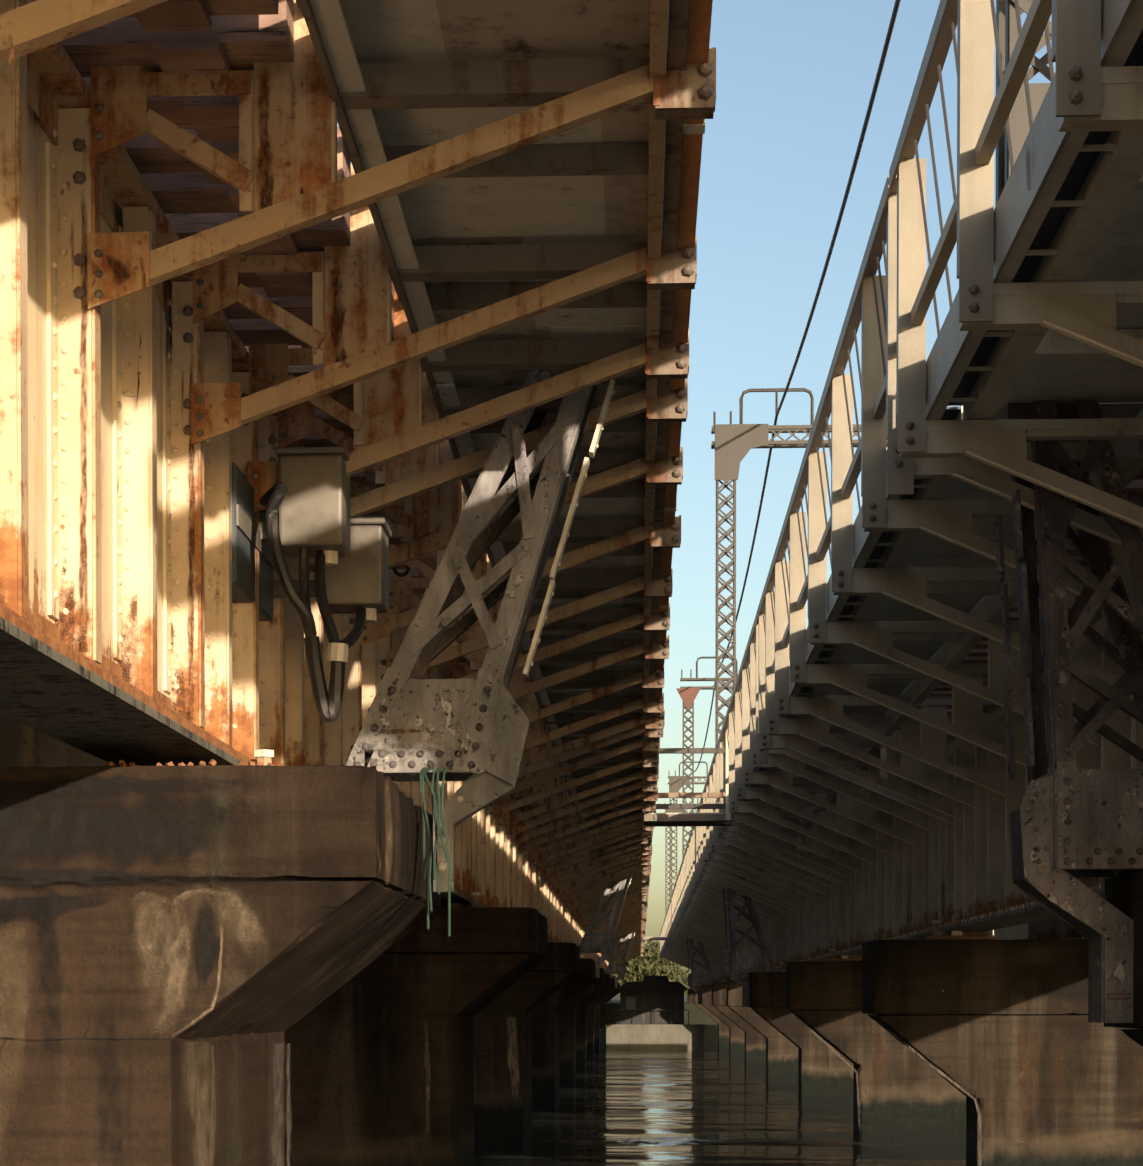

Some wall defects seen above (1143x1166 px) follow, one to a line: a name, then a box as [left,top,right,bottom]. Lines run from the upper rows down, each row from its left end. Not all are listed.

rust [107,257,145,285]
damp [0,776,226,993]
damp [168,910,222,1024]
damp [876,1020,981,1166]